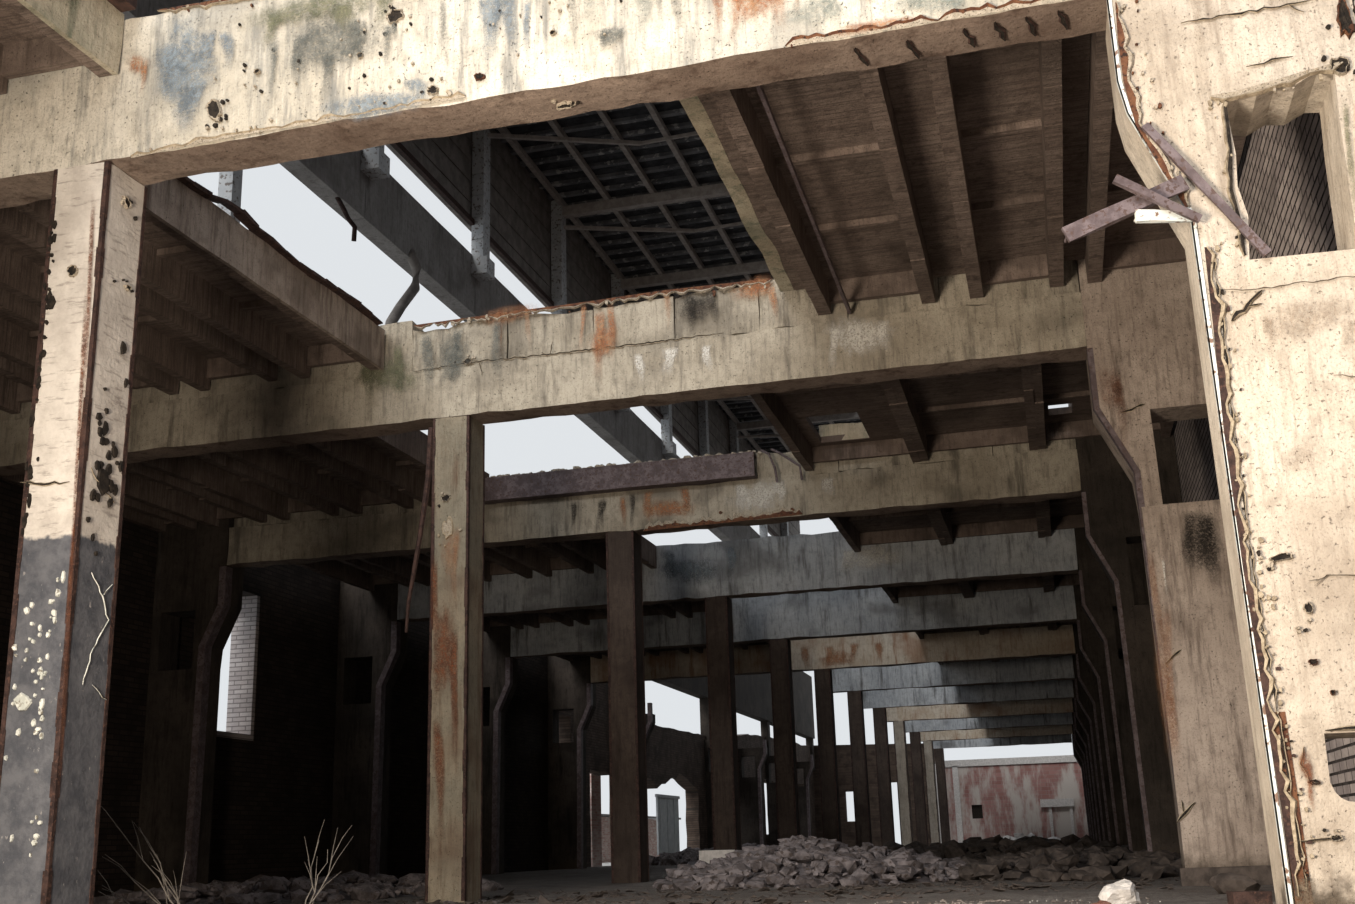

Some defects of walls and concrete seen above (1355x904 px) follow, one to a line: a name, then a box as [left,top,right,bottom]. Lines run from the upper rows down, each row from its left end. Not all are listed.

damp [157,24,233,113]
damp [267,5,364,81]
damp [329,80,424,118]
damp [377,0,396,53]
corrosion [714,0,780,16]
corrosion [581,308,615,360]
peeling [89,408,123,508]
peeling [11,570,65,740]
corrosion [432,566,457,721]
corrosion [434,726,444,807]
peeling [29,815,42,857]
corrosion [1274,712,1313,904]